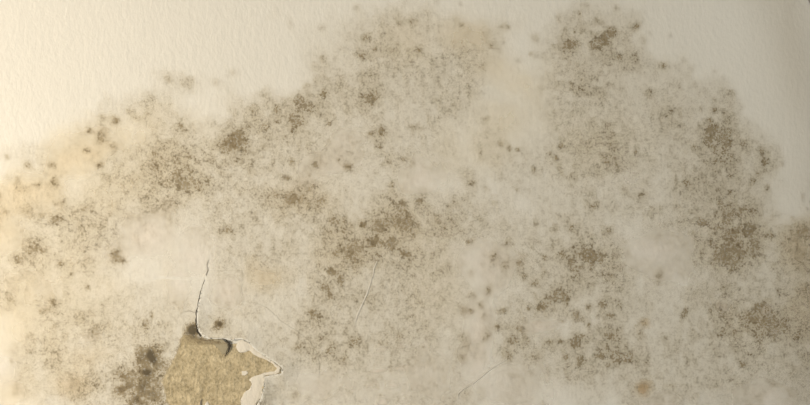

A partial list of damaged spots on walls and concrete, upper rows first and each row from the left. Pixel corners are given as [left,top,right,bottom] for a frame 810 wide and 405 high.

damp [554,27,639,70]
damp [0,128,115,240]
damp [129,89,334,252]
damp [674,108,810,274]
damp [259,168,461,301]
damp [70,341,168,405]
crack [182,260,209,337]
damp [184,319,225,344]
peeling [162,335,282,405]
damp [294,309,368,365]
damp [460,217,649,379]
damp [708,284,809,368]